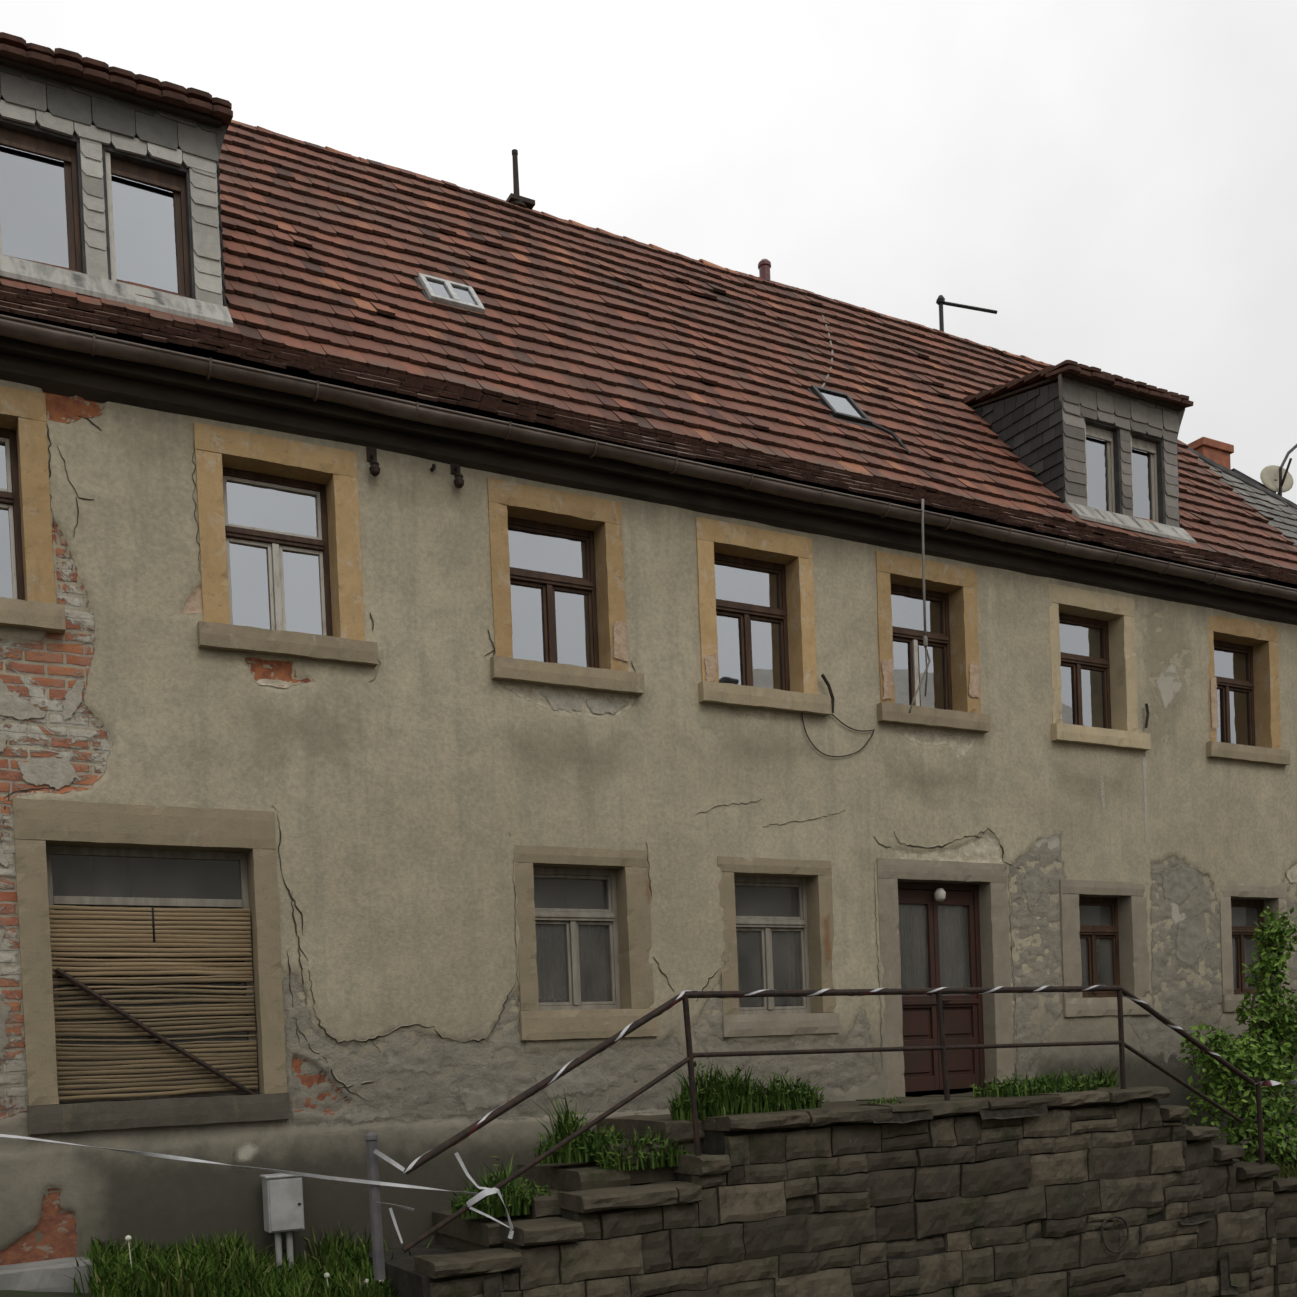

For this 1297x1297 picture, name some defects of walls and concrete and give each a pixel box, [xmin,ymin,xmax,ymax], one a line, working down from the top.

crack [47,425,93,537]
spalling [42,391,104,423]
spalling [244,657,311,688]
spalling [0,524,113,1120]
crack [272,806,520,1098]
spalling [282,973,689,1125]
spalling [693,978,878,1091]
crack [874,827,1017,1074]
spalling [895,832,1065,1081]
spalling [1126,855,1222,1065]
spalling [1283,863,1297,1002]
spalling [0,1189,78,1266]